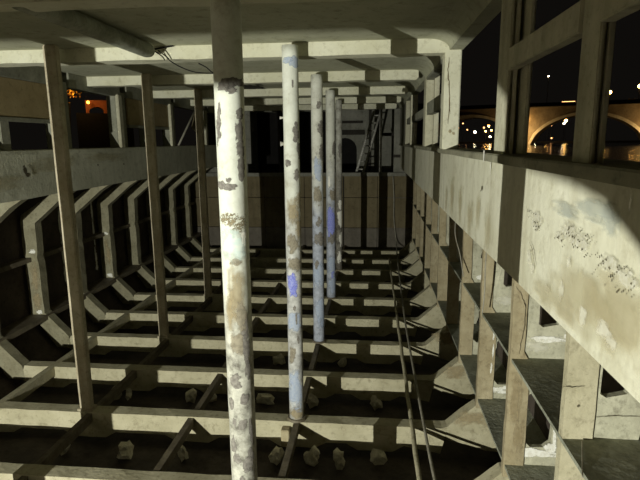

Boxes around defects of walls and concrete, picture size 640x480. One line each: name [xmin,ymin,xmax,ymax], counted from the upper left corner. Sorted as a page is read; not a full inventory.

peeling [217,77,265,94]
peeling [218,108,245,191]
peeling [292,122,300,159]
rust [220,213,246,233]
spalling [554,224,636,298]
rust [227,274,247,332]
peeling [229,316,251,410]
peeling [231,415,254,480]